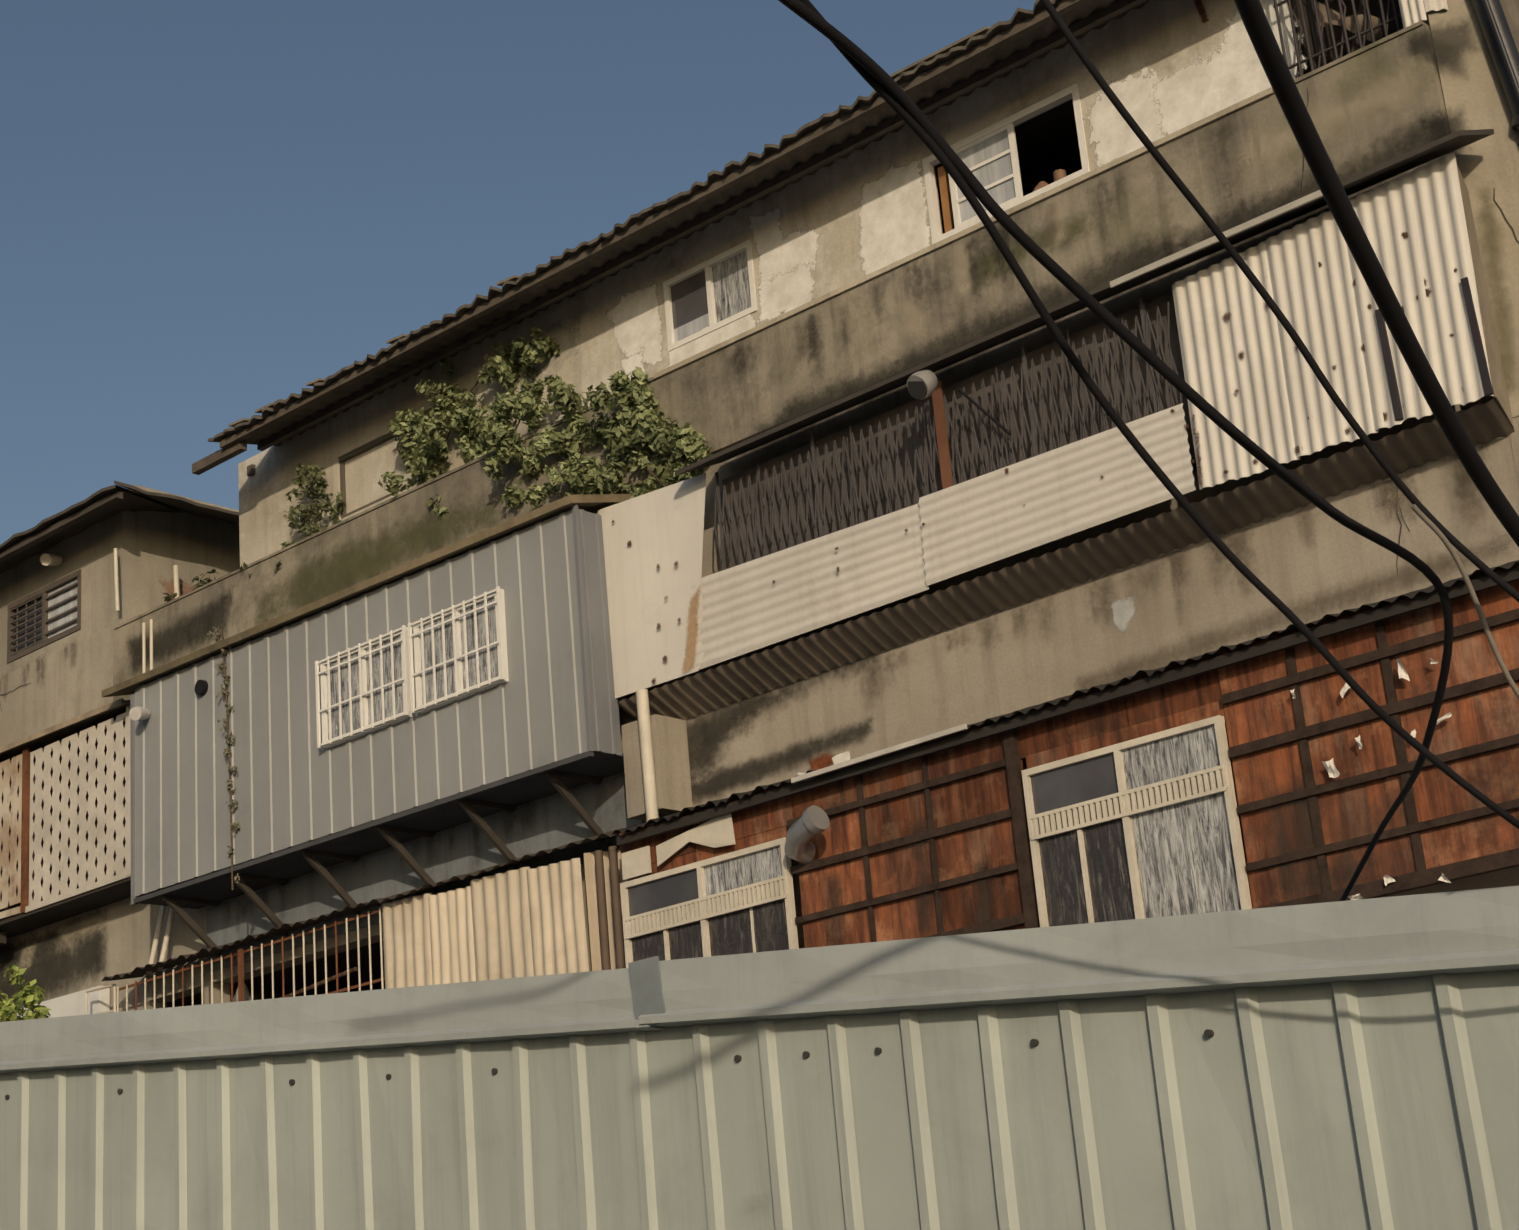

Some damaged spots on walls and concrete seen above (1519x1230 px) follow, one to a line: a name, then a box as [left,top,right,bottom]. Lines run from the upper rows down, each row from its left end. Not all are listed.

peeling [1082,8,1272,168]
peeling [1260,0,1307,79]
leakage [1409,21,1477,60]
leakage [1338,113,1464,181]
peeling [857,159,931,276]
crack [1493,188,1519,243]
peeling [607,208,820,381]
leakage [757,175,1329,443]
leakage [1083,545,1501,689]
leakage [0,916,104,1005]